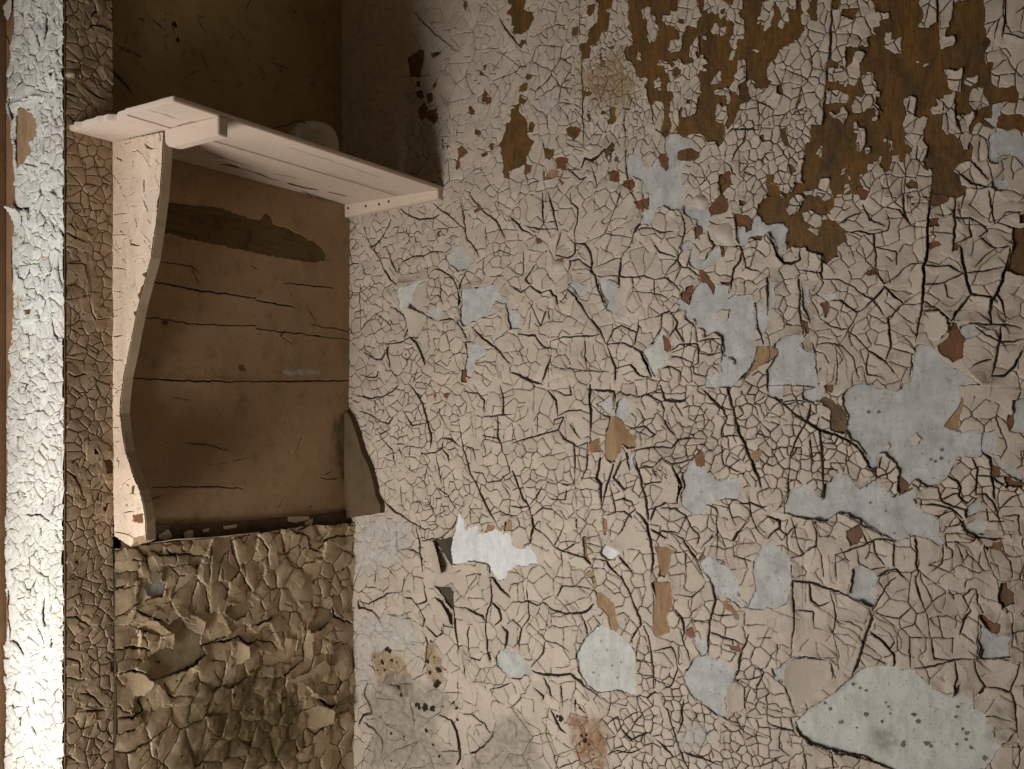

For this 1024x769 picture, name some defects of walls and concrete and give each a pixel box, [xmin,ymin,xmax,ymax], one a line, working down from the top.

crack [824,11,833,103]
peeling [481,74,569,185]
peeling [566,0,1024,551]
crack [135,62,1022,769]
crack [7,595,87,653]
crack [68,658,103,711]
water stain [360,622,413,697]
water stain [426,640,442,689]
water stain [415,701,459,721]
flaking render [423,514,538,627]
flaking render [575,515,675,696]
flaking render [796,663,1000,769]